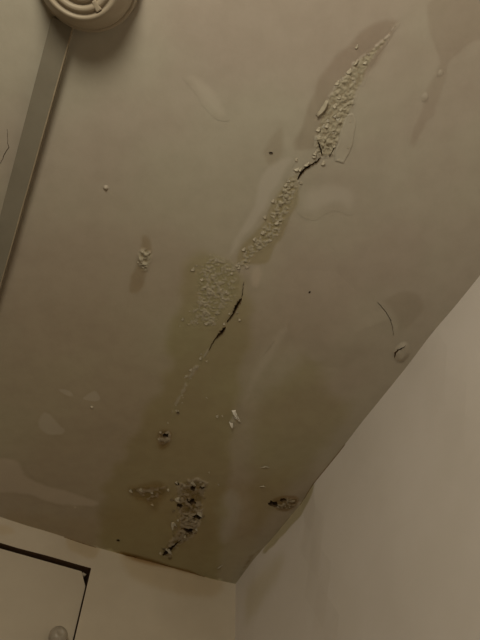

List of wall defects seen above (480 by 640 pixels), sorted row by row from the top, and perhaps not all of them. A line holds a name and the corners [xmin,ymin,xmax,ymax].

peeling [312,21,401,165]
crack [297,140,334,180]
peeling [235,158,303,272]
crack [209,284,244,350]
spalling [158,471,219,560]
spalling [268,497,300,511]